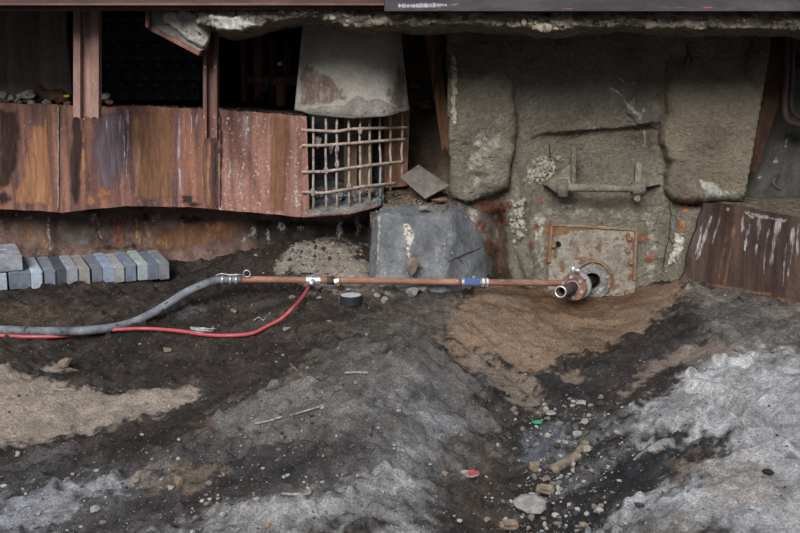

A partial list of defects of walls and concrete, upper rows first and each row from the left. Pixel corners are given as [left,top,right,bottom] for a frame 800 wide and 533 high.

rust [16,120,53,206]
rust [82,133,110,205]
rust [201,129,211,205]
rust [270,117,289,211]
crack [543,121,654,178]
rust [473,191,512,279]
rust [527,221,588,265]
rust [678,199,702,232]